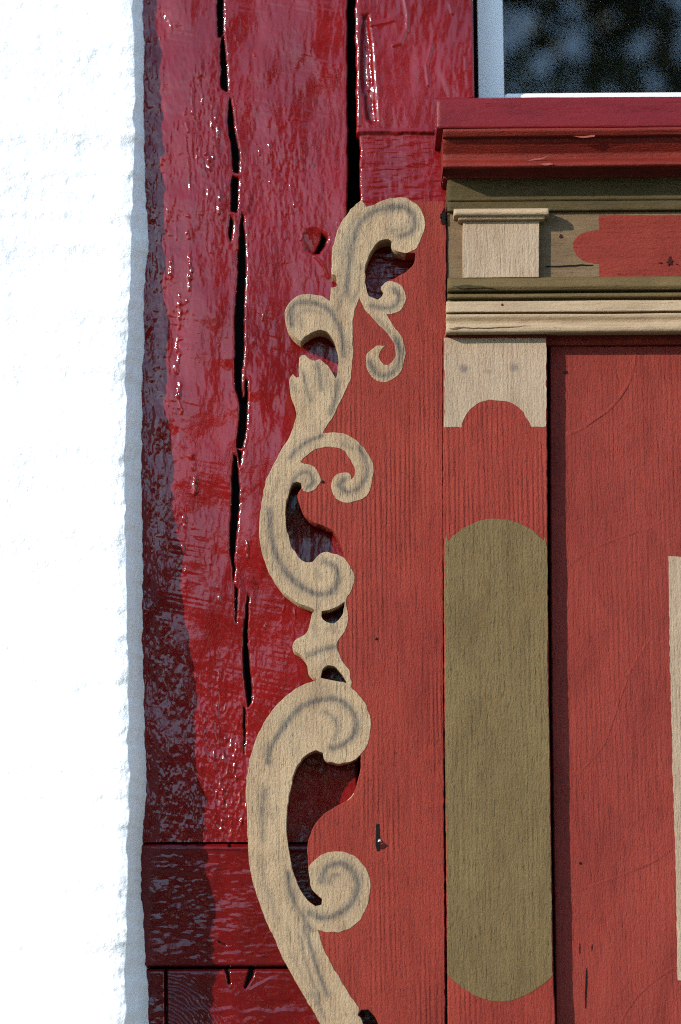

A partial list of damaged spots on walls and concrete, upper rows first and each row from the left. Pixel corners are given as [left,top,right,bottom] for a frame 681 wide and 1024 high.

crack [217,0,253,743]